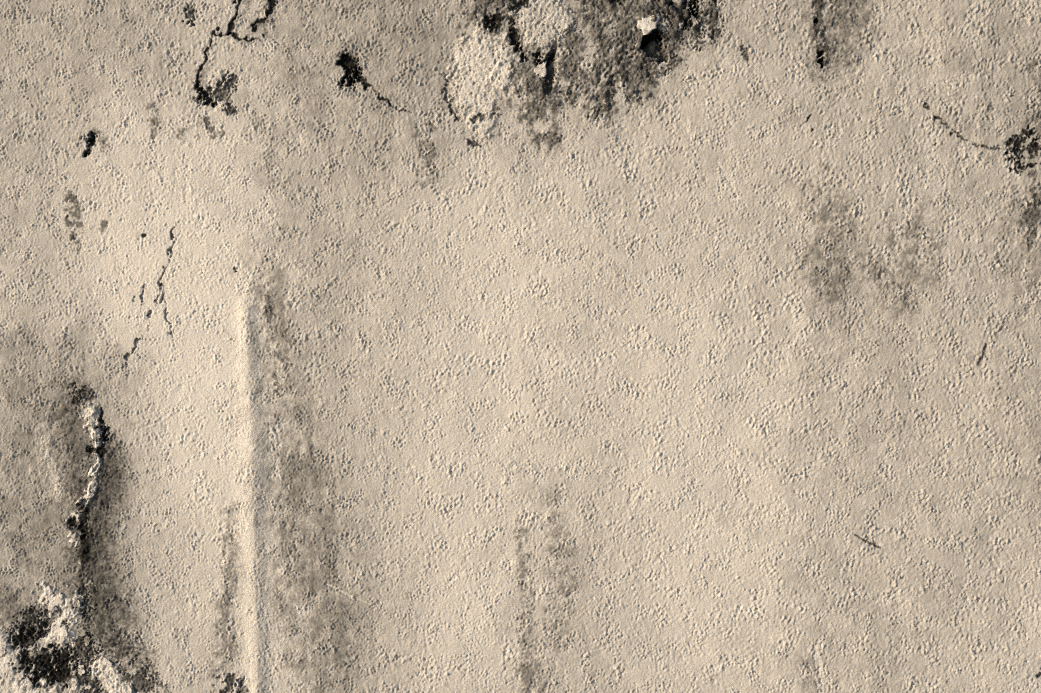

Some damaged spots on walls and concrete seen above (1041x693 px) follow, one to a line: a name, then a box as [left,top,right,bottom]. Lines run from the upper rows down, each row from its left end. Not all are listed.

crack [195,0,276,91]
crack [358,75,412,113]
water stain [450,0,718,149]
water stain [803,0,871,81]
crack [924,102,1009,154]
crack [141,227,175,299]
flaking render [0,381,168,693]
peeling [213,673,250,693]